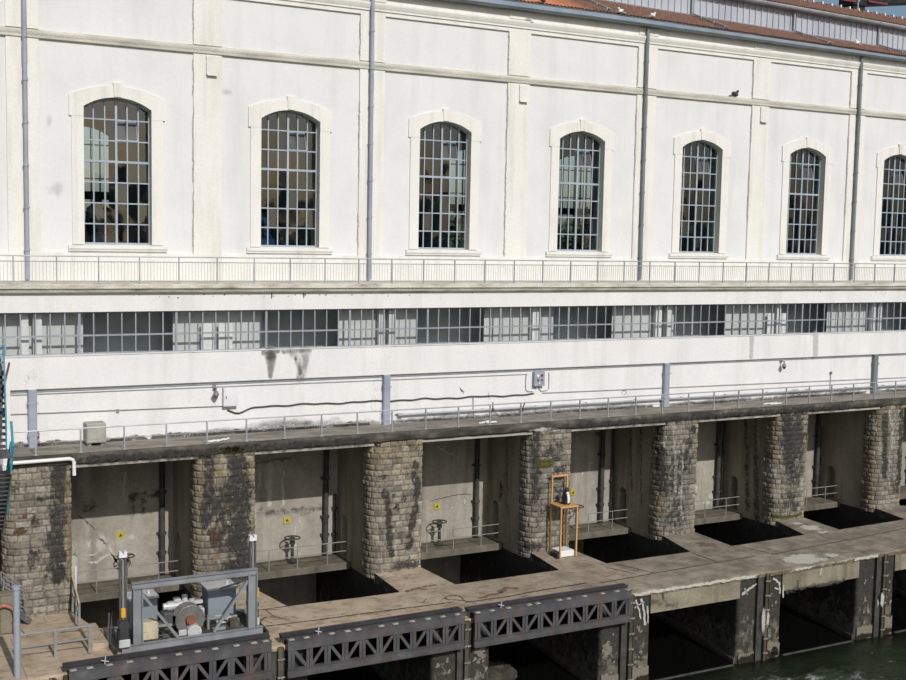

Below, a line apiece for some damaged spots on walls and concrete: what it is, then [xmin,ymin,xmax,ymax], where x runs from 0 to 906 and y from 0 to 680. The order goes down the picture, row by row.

leakage [262,346,307,378]
leakage [11,440,85,448]
leakage [78,437,370,551]
leakage [106,421,379,442]
leakage [393,391,866,522]
leakage [888,409,896,487]